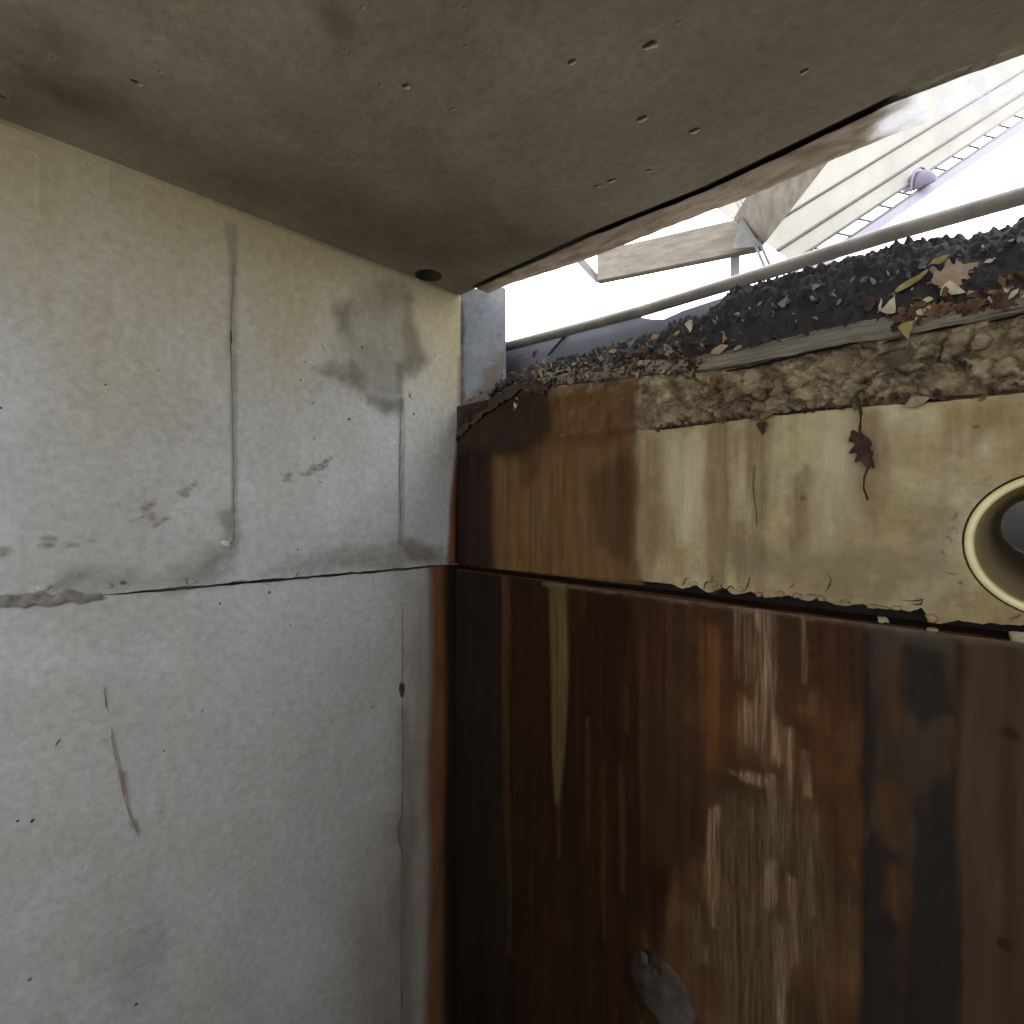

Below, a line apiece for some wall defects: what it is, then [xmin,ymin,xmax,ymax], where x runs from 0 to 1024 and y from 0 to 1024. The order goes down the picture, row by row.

crack [228,265,236,541]
spalling [539,313,1024,433]
rust [490,379,640,585]
spalling [0,581,127,608]
crack [105,564,452,595]
spalling [866,599,940,632]